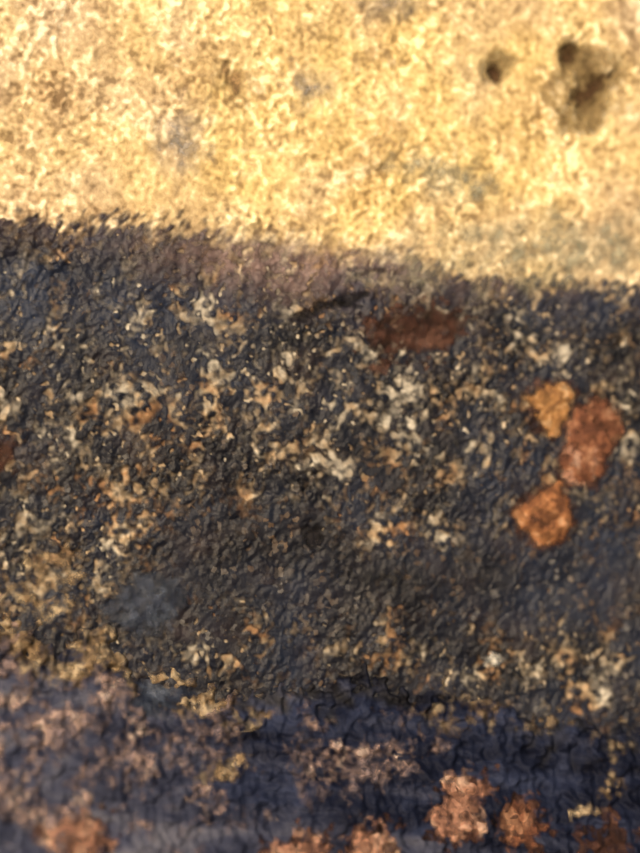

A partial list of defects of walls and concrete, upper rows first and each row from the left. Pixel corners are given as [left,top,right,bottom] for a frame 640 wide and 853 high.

water stain [503,214,591,273]
water stain [599,225,628,269]
corrosion [512,380,624,547]
water stain [0,621,34,686]
water stain [0,695,31,708]
water stain [91,674,143,713]
water stain [17,705,88,768]
water stain [101,729,155,771]
water stain [187,726,225,760]
water stain [0,768,75,851]